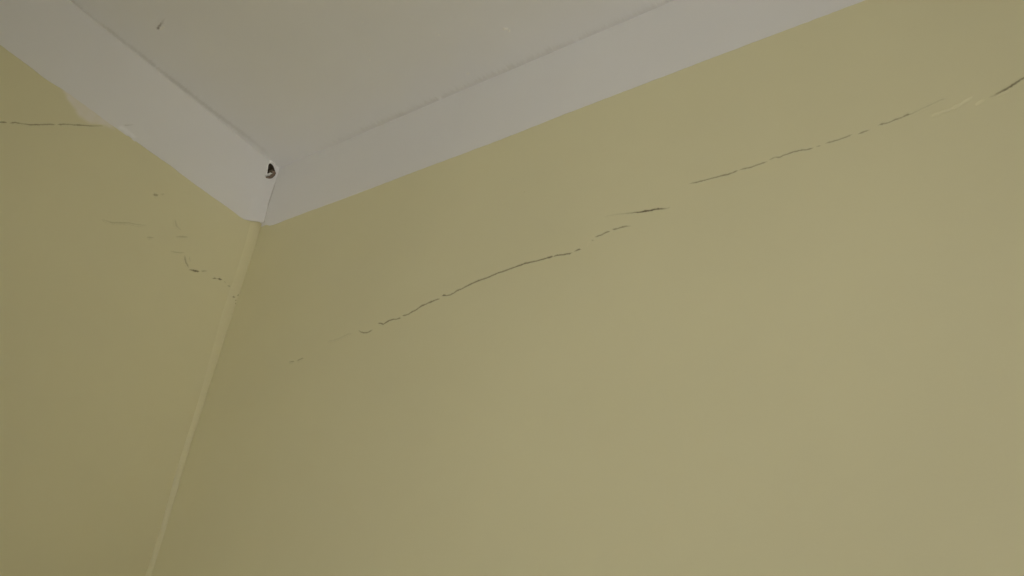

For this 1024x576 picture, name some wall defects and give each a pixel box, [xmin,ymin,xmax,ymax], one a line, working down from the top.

crack [688,74,1024,185]
crack [327,206,671,343]